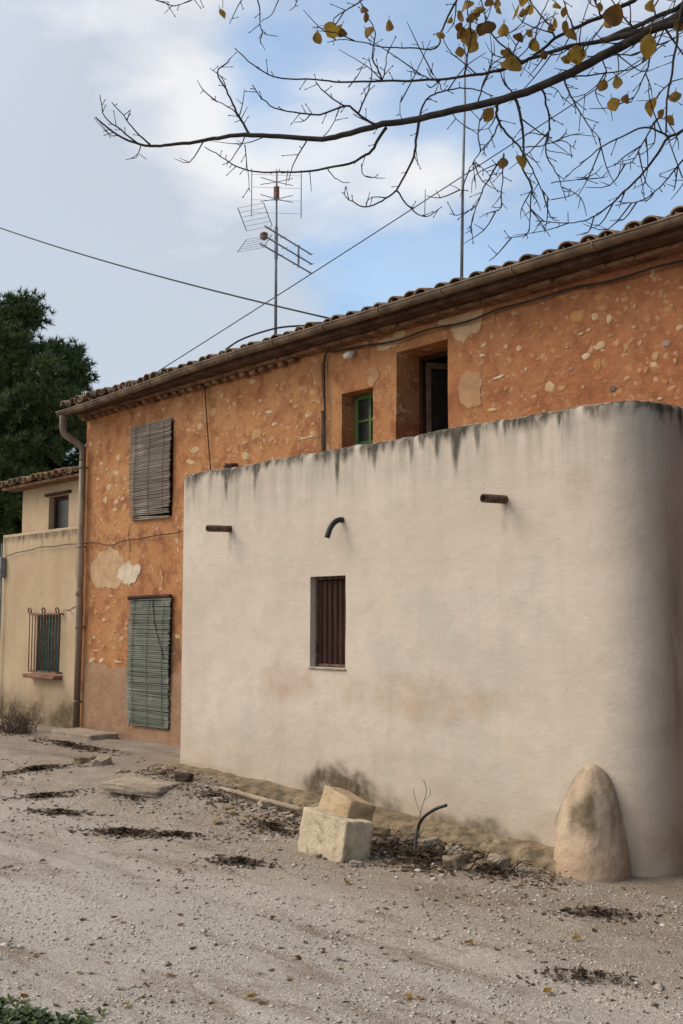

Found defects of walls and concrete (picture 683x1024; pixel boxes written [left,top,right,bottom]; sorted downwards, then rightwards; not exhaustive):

flaking render [438,308,484,344]
flaking render [570,291,619,371]
flaking render [458,370,510,412]
flaking render [545,381,566,393]
water stain [587,400,682,427]
water stain [315,409,566,479]
flaking render [88,546,141,663]